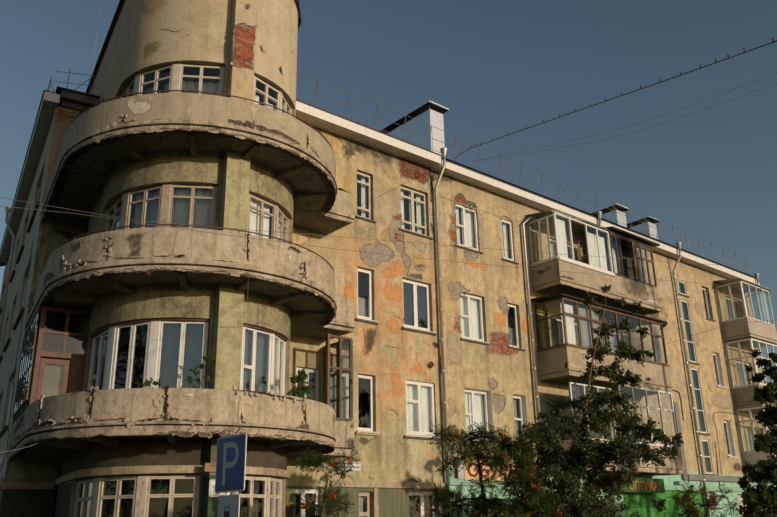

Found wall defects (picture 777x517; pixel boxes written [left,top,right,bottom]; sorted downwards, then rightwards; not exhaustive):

flaking render [230,23,257,70]
spalling [42,96,351,218]
flaking render [395,156,432,185]
flaking render [449,192,487,270]
flaking render [359,213,427,302]
flaking render [447,280,471,301]
leakage [363,328,376,354]
flaking render [485,296,519,356]
crack [37,386,214,436]
spalling [154,393,335,454]
flaking render [487,377,507,415]